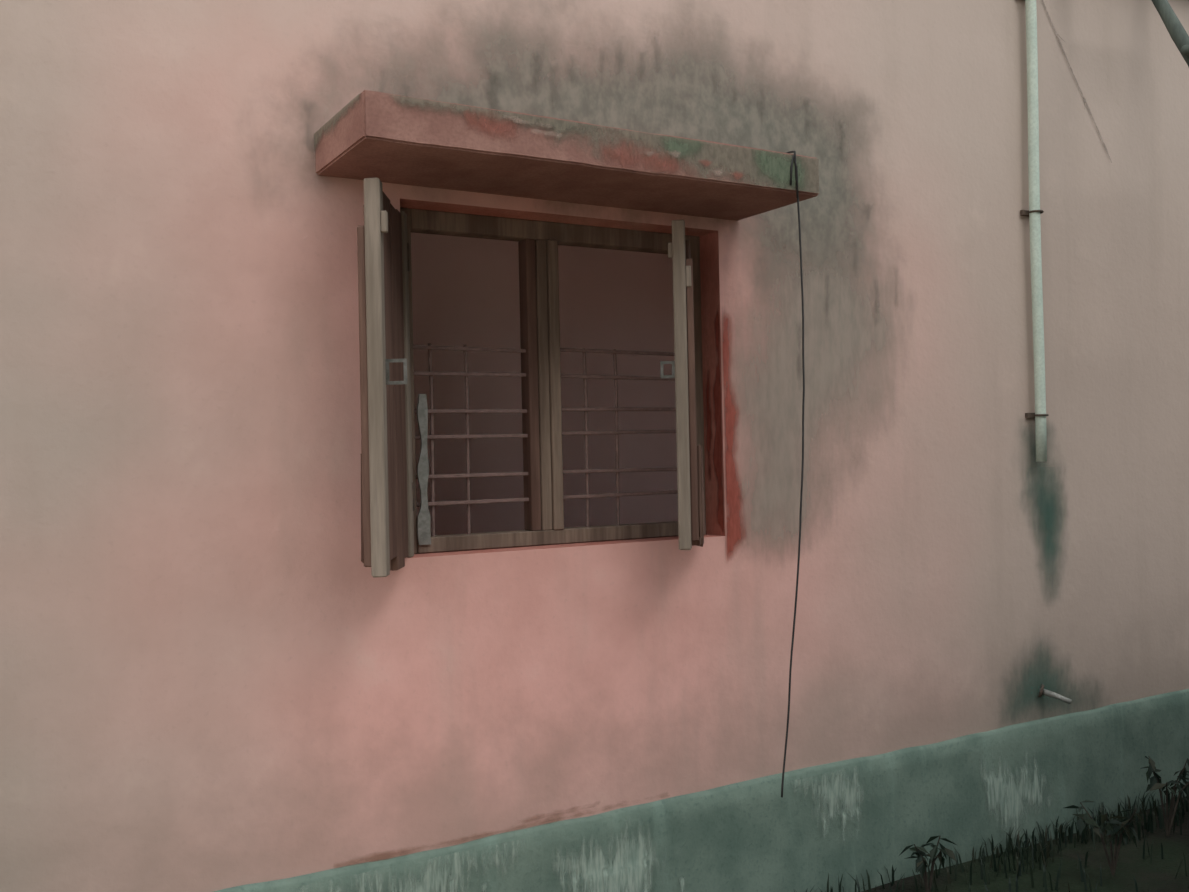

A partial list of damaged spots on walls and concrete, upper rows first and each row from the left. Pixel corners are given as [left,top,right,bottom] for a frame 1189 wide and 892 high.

leakage [380,31,887,541]
corrosion [706,311,744,557]